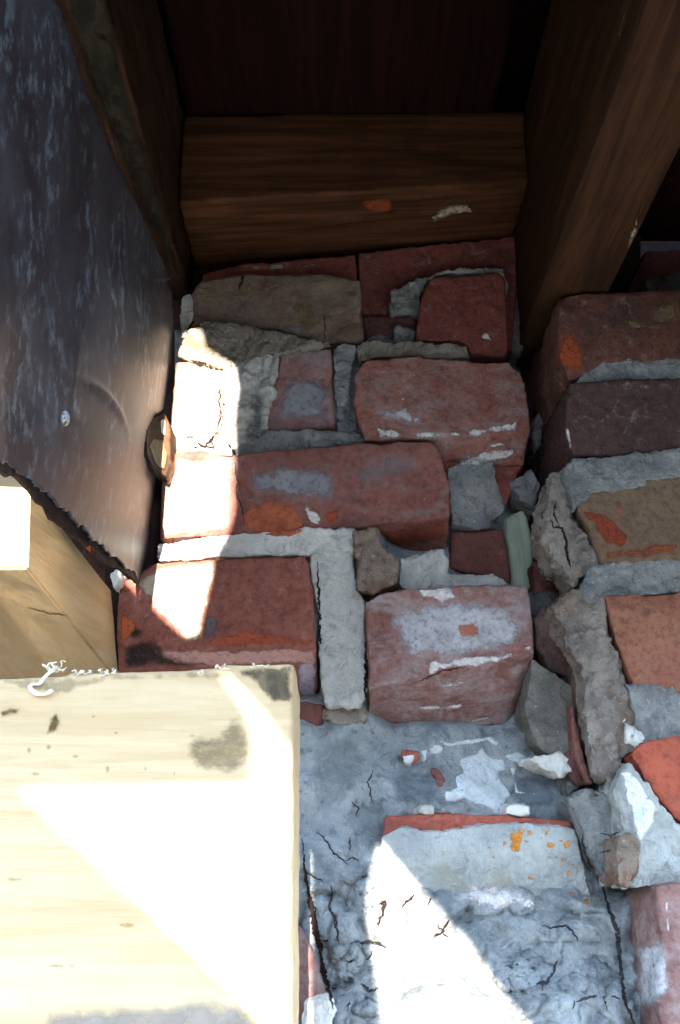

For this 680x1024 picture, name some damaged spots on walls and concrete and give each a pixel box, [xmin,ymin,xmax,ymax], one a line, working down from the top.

crack [550,501,571,569]
water stain [393,588,516,674]
crack [301,770,449,1011]
crack [541,924,578,941]
crack [572,831,635,1024]
crack [536,961,558,991]